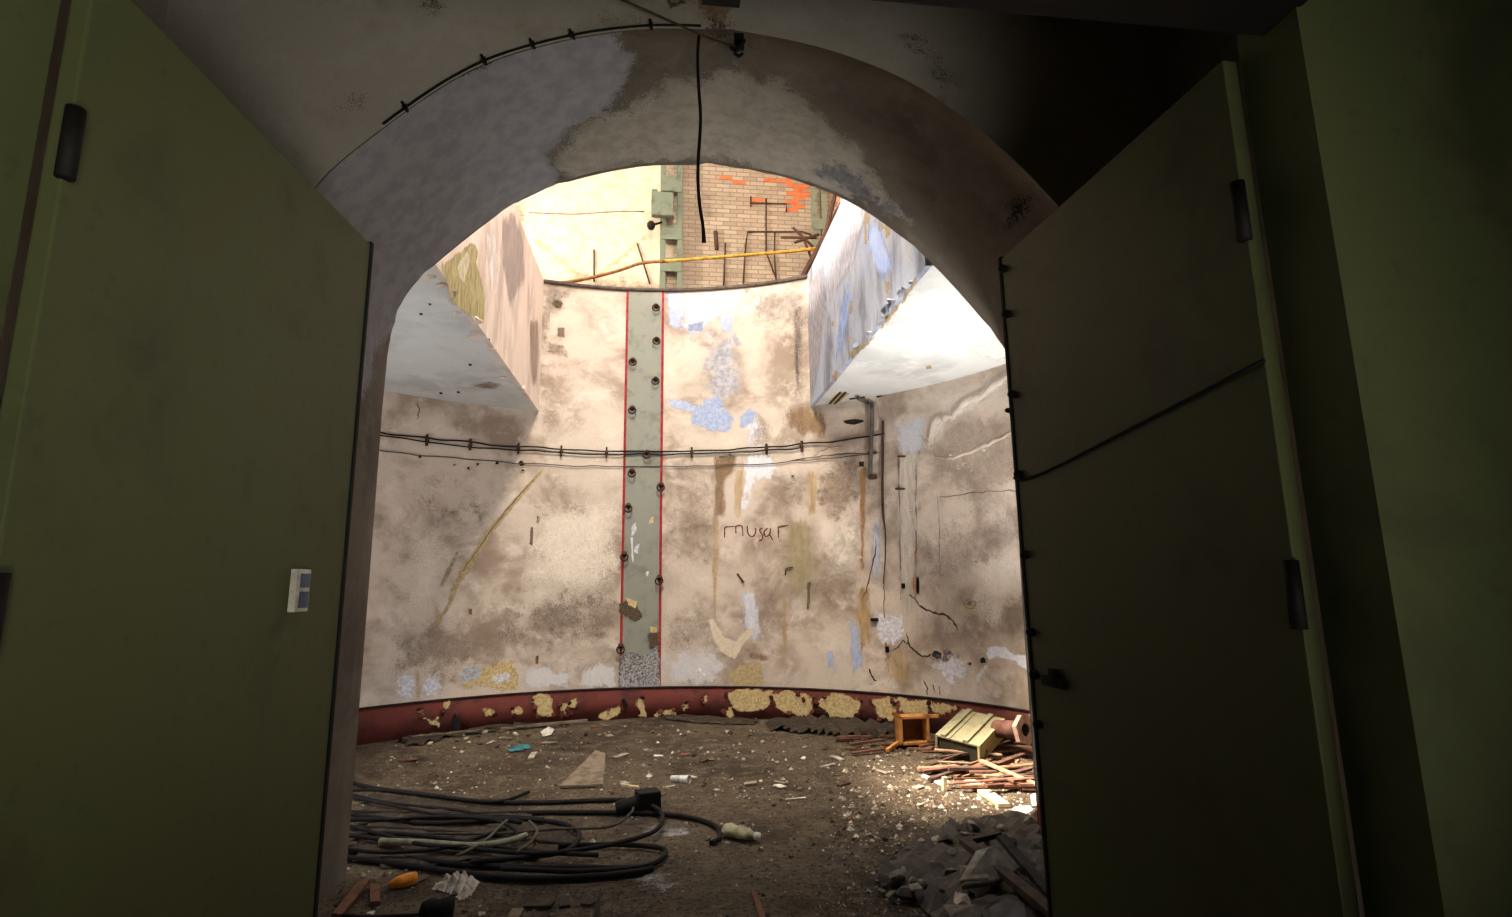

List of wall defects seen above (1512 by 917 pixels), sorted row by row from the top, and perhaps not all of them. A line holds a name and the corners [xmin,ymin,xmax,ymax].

peeling [547,51,920,426]
peeling [668,394,767,447]
corrosion [711,453,744,618]
peeling [856,521,882,585]
peeling [415,701,451,741]
peeling [452,589,961,770]